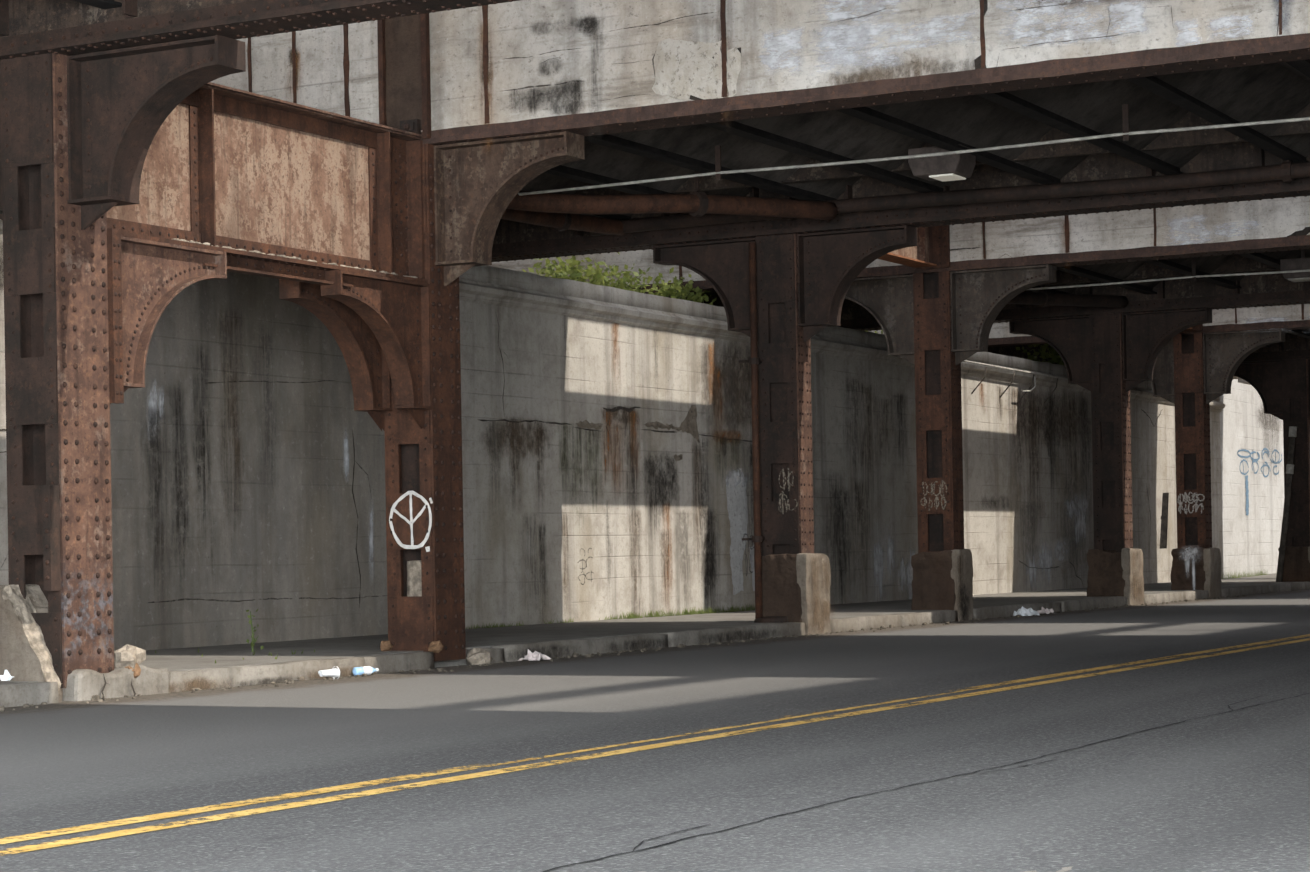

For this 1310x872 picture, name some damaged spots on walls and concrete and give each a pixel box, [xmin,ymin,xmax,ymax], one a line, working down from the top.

damp [576,18,597,57]
peeling [984,0,1146,43]
peeling [1177,17,1250,47]
damp [514,76,596,114]
spalling [652,38,741,101]
damp [487,422,545,490]
corrosion [604,410,638,487]
damp [634,457,676,592]